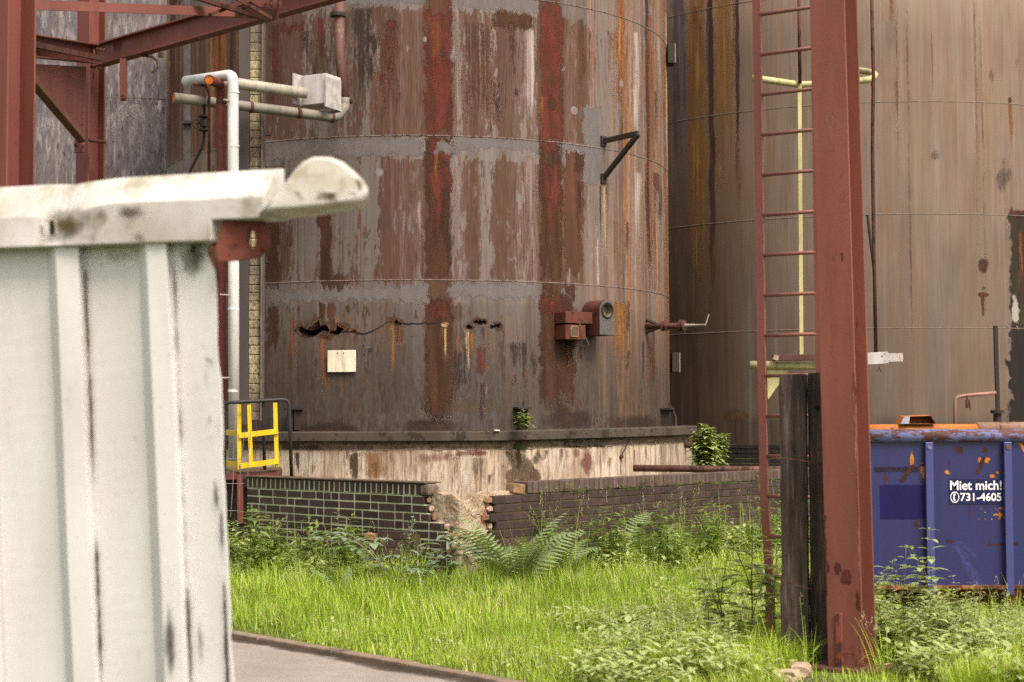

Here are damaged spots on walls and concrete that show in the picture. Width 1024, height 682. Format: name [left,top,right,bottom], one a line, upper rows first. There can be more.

peeling [399,0,590,419]
damp [346,450,360,479]
damp [454,455,491,487]